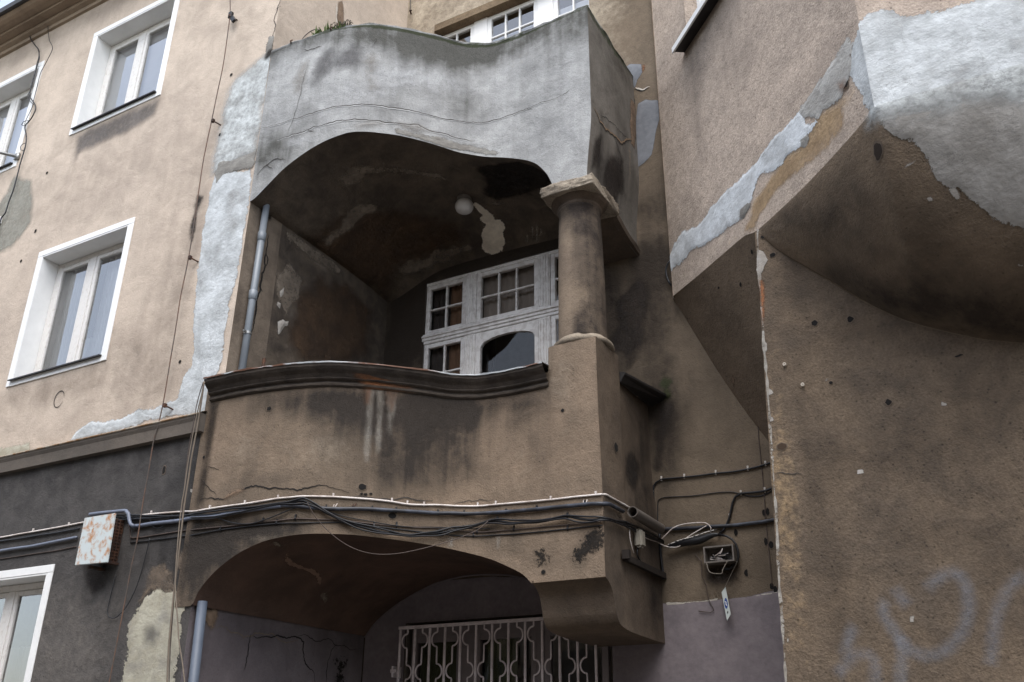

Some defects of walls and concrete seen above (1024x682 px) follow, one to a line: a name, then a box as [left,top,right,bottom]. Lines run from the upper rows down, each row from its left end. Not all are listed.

crack [257,46,568,175]
crack [594,86,650,158]
damp [0,177,32,251]
spalling [739,109,843,291]
peeling [276,204,377,361]
crack [198,466,428,505]
damp [572,526,606,564]
peeling [760,307,789,682]
spalling [121,552,185,682]
crack [245,634,355,681]